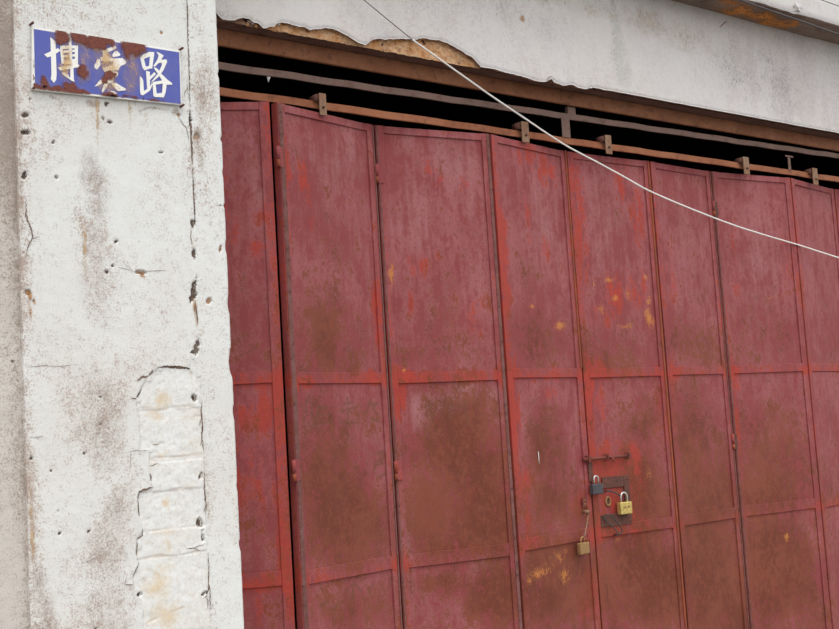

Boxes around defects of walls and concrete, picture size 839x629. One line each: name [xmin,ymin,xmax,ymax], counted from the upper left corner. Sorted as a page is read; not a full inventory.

corrosion [719,0,799,29]
spalling [216,17,480,69]
crack [25,204,36,255]
peeling [128,339,211,629]